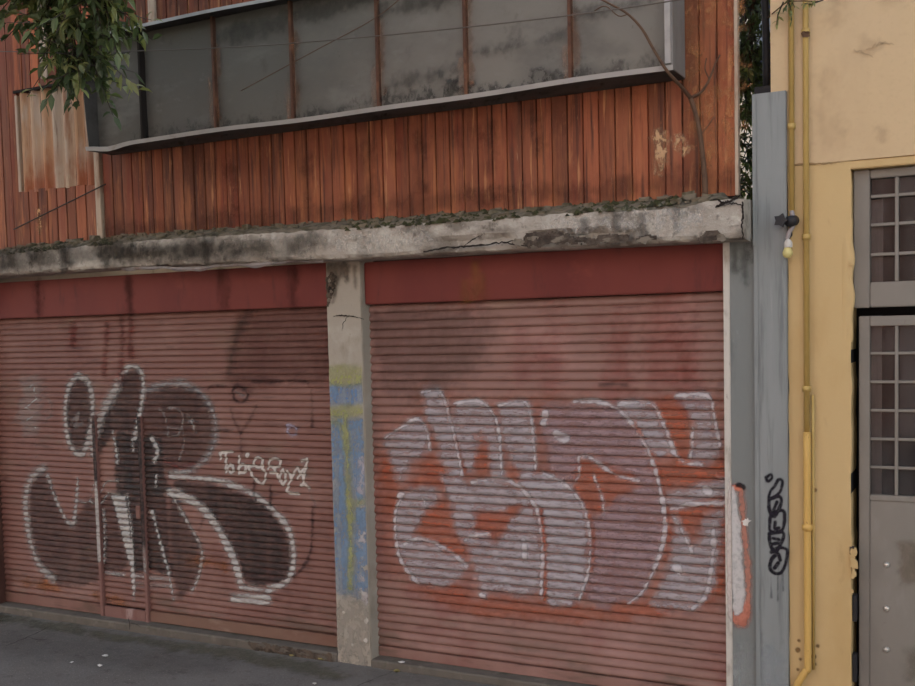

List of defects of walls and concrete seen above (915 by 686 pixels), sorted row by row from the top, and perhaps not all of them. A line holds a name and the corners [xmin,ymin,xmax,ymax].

damp [380,79,510,114]
peeling [653,130,690,171]
crack [710,195,744,239]
crack [423,236,528,252]
spalling [523,231,657,248]
spalling [698,230,726,243]